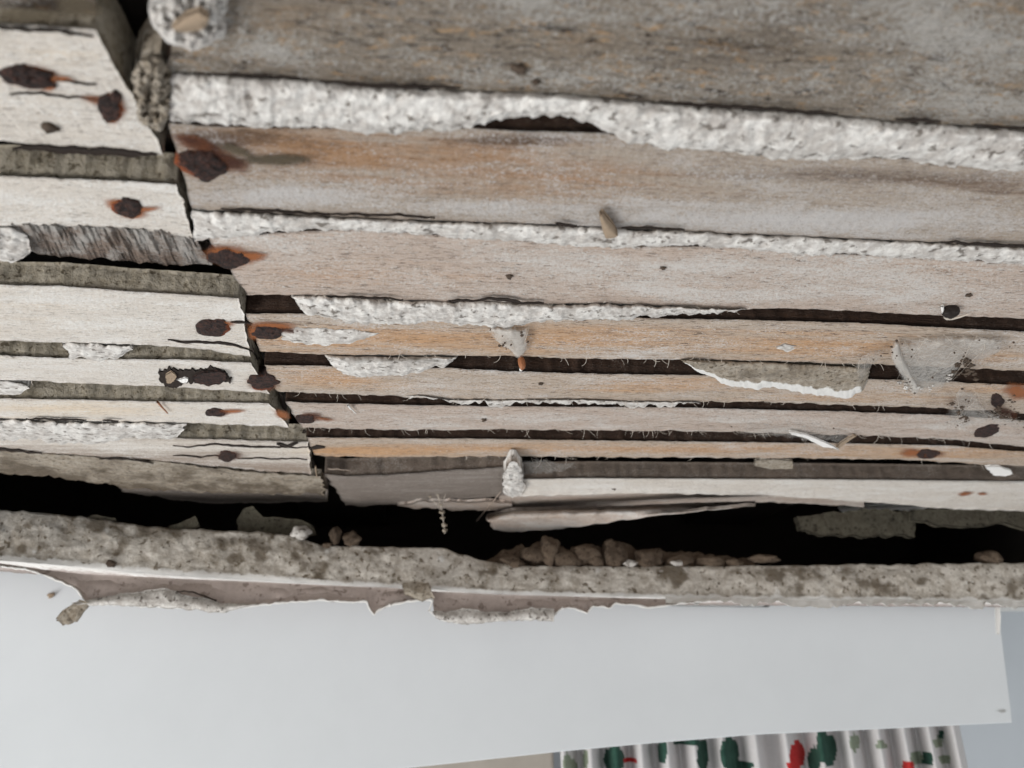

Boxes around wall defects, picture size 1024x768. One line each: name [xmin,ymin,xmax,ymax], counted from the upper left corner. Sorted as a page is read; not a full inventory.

flaking render [131,0,1024,172]
rust [177,136,247,173]
rust [208,247,266,260]
flaking render [191,208,1024,265]
rust [249,323,298,339]
flaking render [281,295,746,377]
peeling [165,370,227,386]
flaking render [680,359,870,399]
rust [1000,385,1024,419]
flaking render [0,418,326,495]
flaking render [502,449,526,498]
peeling [0,563,1024,635]